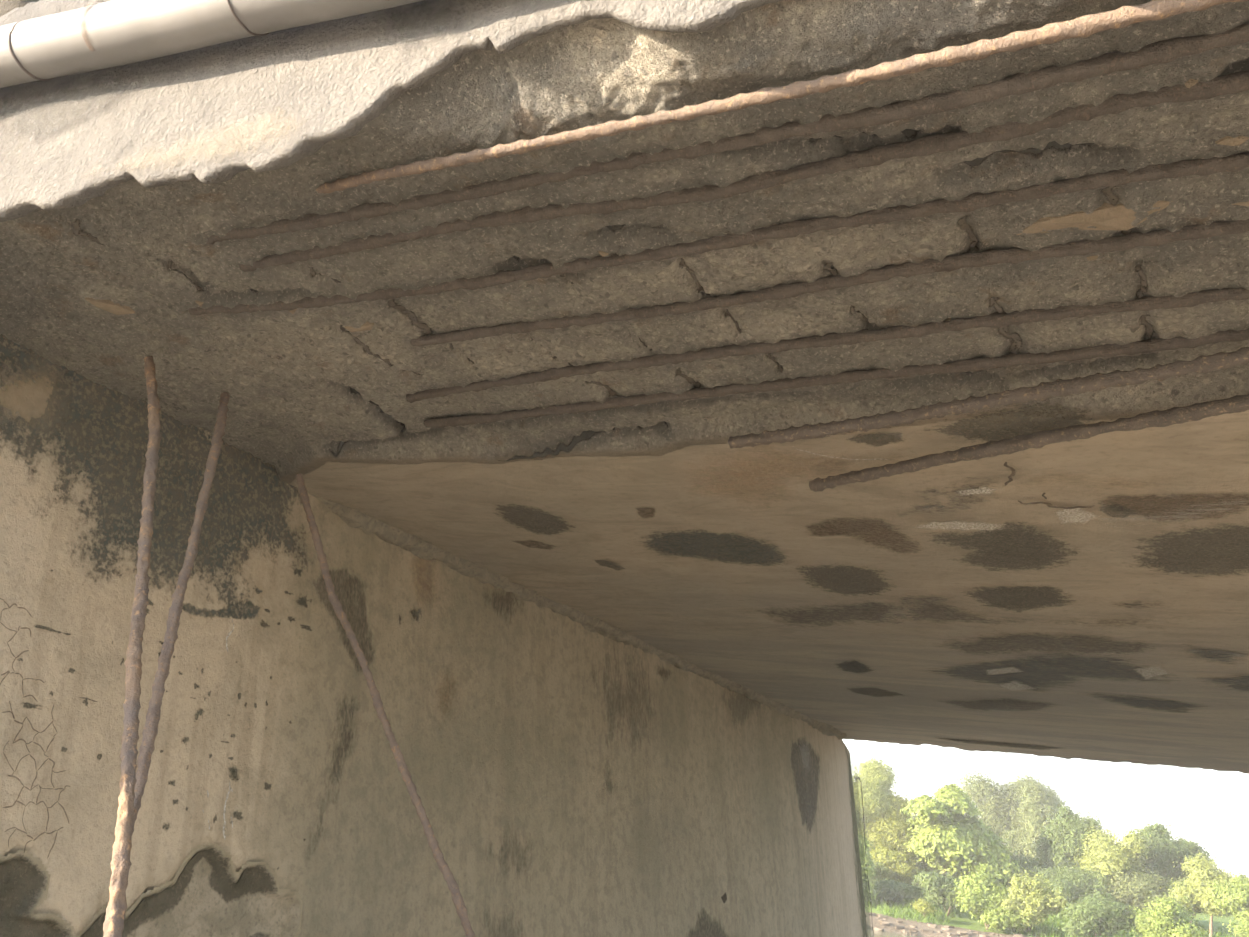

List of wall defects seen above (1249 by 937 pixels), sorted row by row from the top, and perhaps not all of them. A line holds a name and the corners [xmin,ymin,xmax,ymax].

spalling [0,0,1249,483]
damp [0,334,312,663]
damp [496,504,575,549]
damp [644,529,786,566]
damp [808,487,1078,571]
damp [1055,494,1249,577]
damp [317,570,373,672]
damp [769,565,897,626]
damp [911,586,1200,713]
crack [0,598,97,858]
damp [791,741,819,831]
damp [939,738,1057,750]